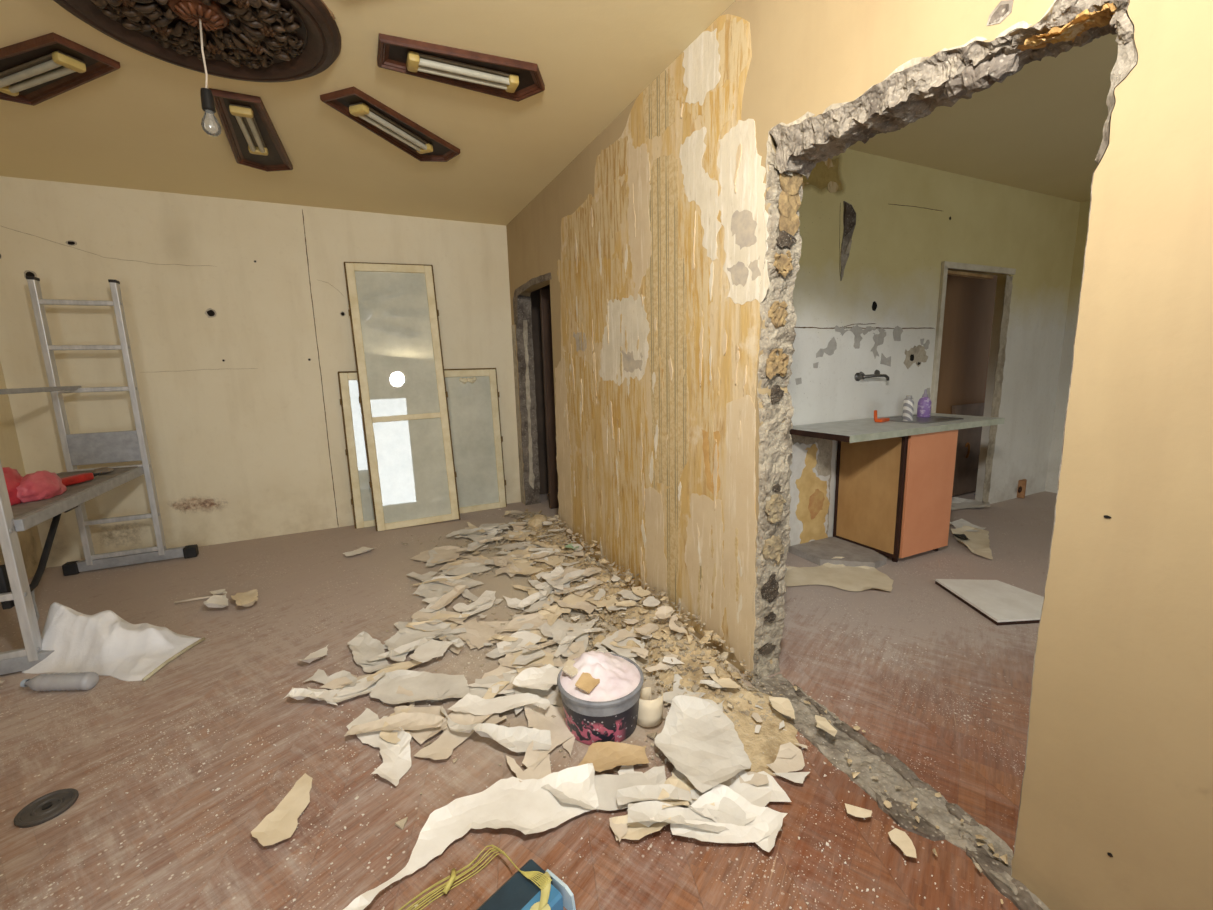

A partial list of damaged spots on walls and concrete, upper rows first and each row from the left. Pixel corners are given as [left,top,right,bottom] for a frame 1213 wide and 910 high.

flaking render [680,28,721,119]
spalling [986,0,1013,26]
flaking render [679,119,770,397]
spalling [801,158,856,281]
flaking render [564,287,684,493]
peeling [813,325,930,369]
spalling [982,275,1013,503]
peeling [640,423,669,590]
spalling [787,435,832,552]
peeling [123,711,290,801]
peeling [296,751,454,888]